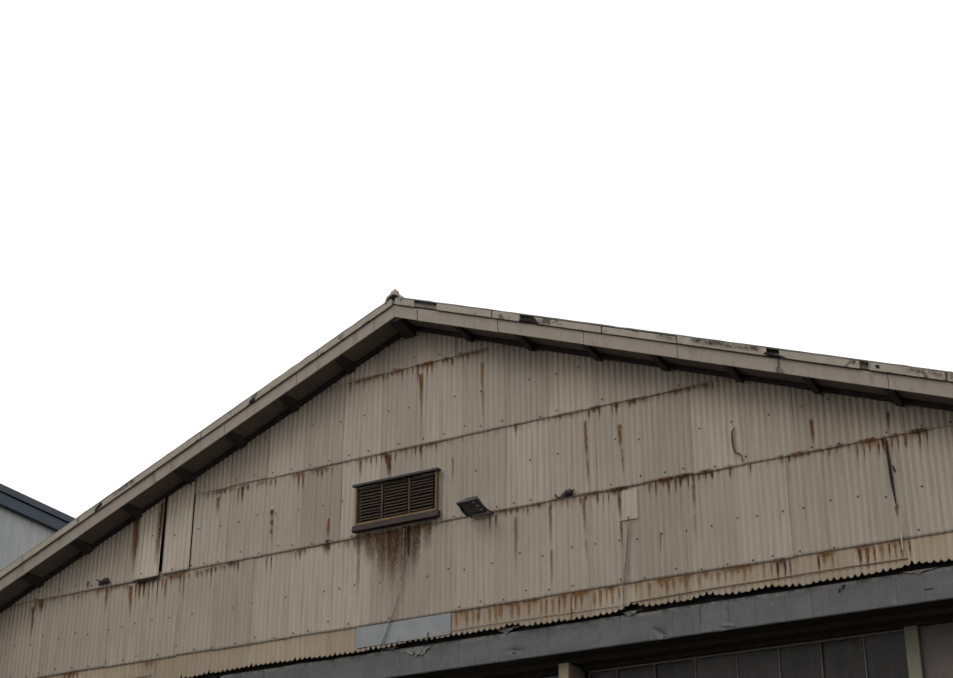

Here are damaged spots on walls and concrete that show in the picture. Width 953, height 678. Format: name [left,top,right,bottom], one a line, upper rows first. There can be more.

rust [584,396,645,452]
rust [856,428,928,456]
rust [649,470,713,496]
rust [580,486,625,540]
rust [132,519,140,555]
rust [857,539,911,564]
rust [636,564,747,592]
rust [455,586,620,624]